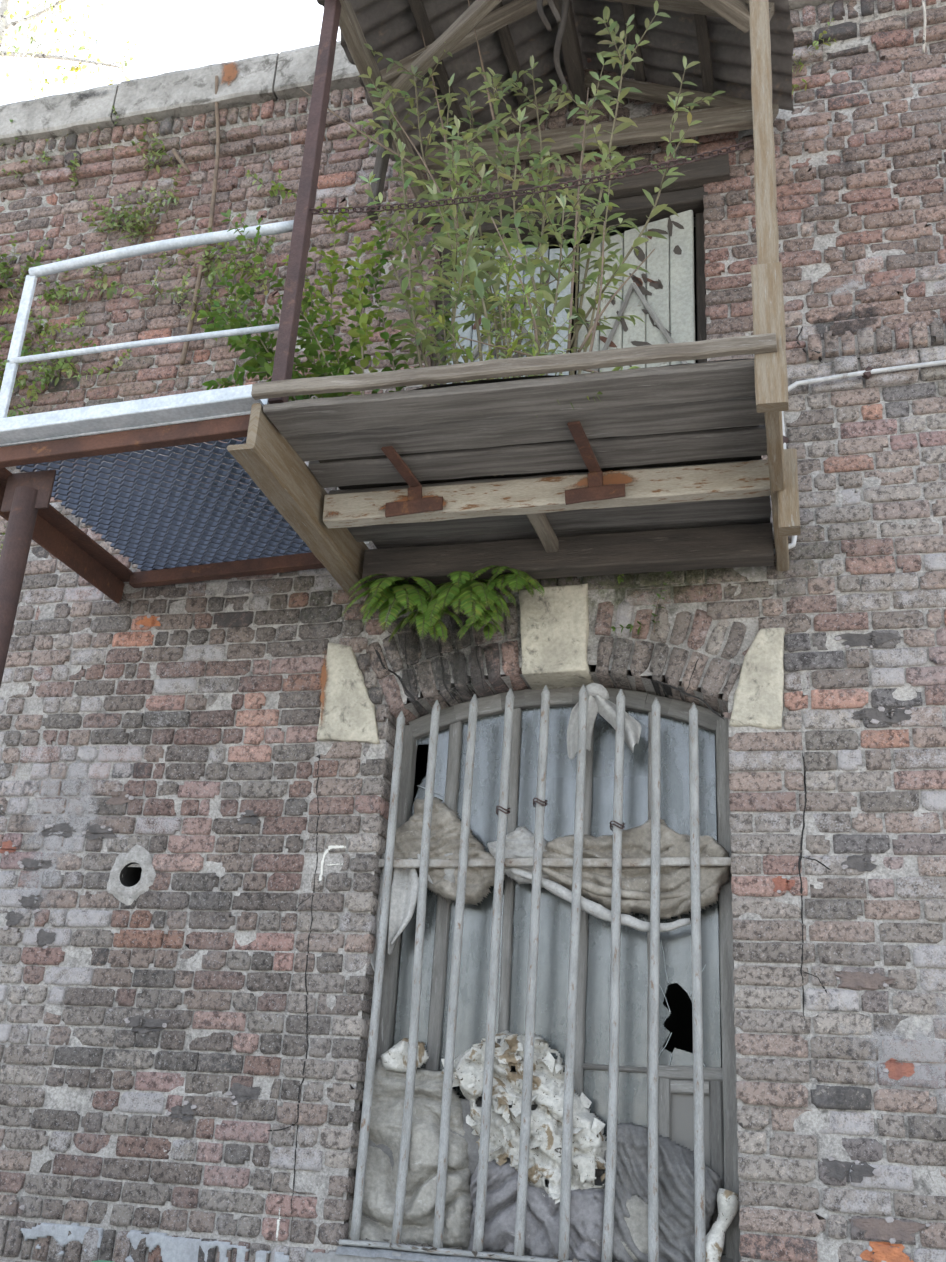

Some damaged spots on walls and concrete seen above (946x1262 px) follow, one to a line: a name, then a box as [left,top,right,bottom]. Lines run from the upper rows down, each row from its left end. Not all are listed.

corrosion [603,471,634,485]
crack [798,752,831,1023]
flaking render [5,1201,104,1256]
flaking render [125,1230,289,1262]